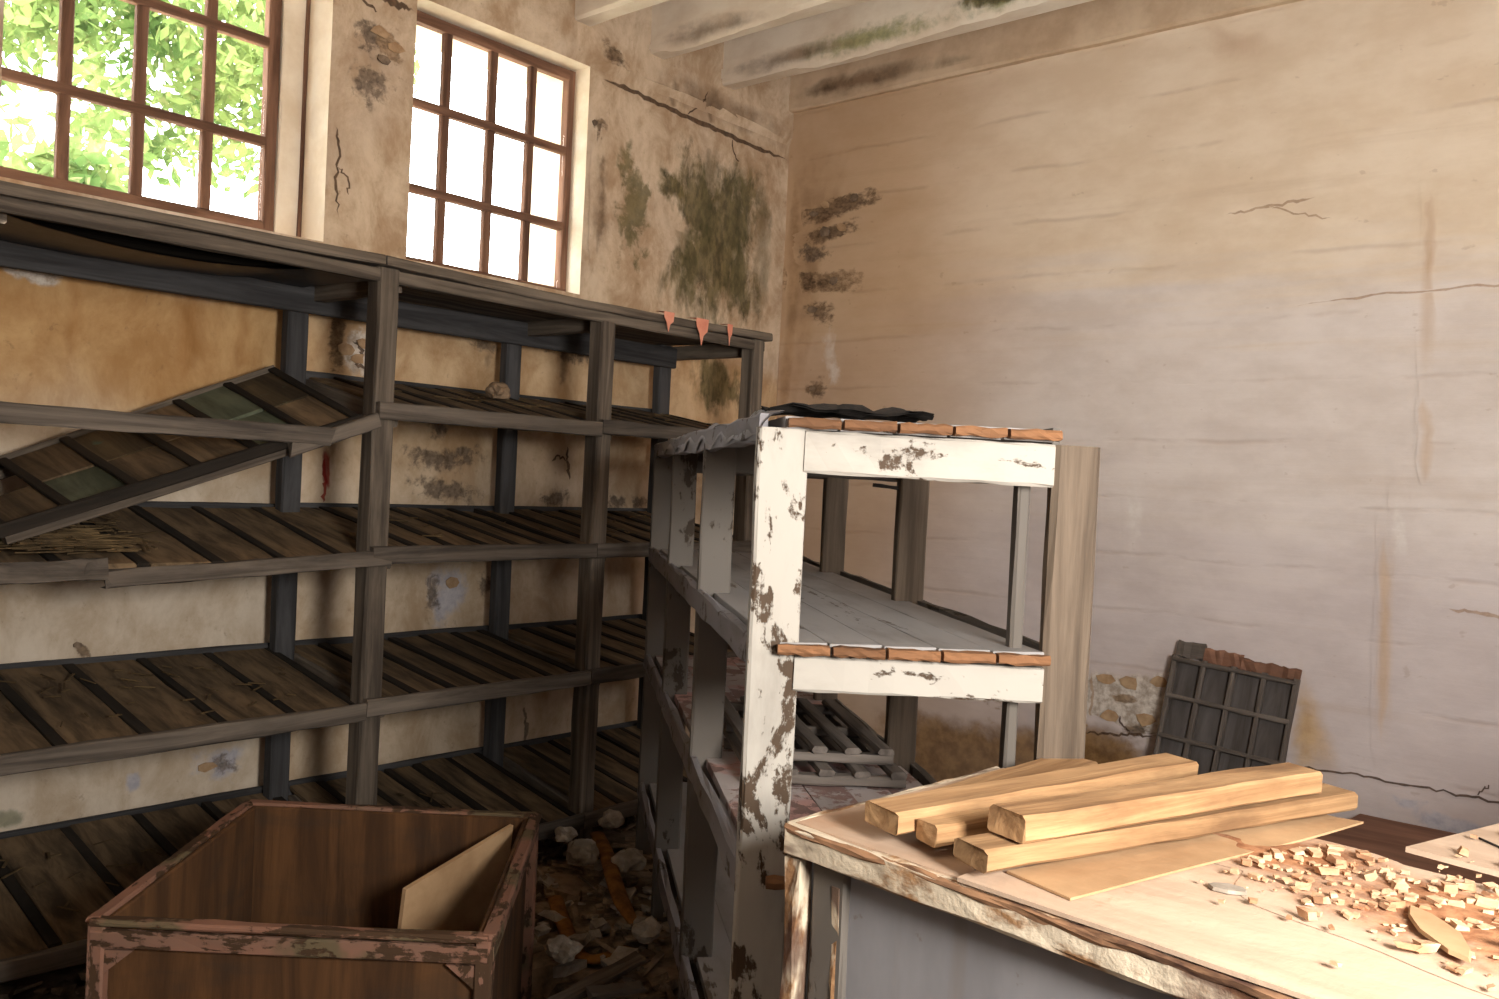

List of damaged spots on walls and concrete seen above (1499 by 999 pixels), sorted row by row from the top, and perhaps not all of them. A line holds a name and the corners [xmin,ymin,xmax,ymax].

crack [362,0,415,13]
leakage [338,6,406,117]
leakage [633,6,988,418]
crack [1224,196,1334,220]
crack [1297,283,1499,306]
leakage [1414,162,1441,485]
peeling [1086,664,1170,733]
crack [1303,766,1499,804]